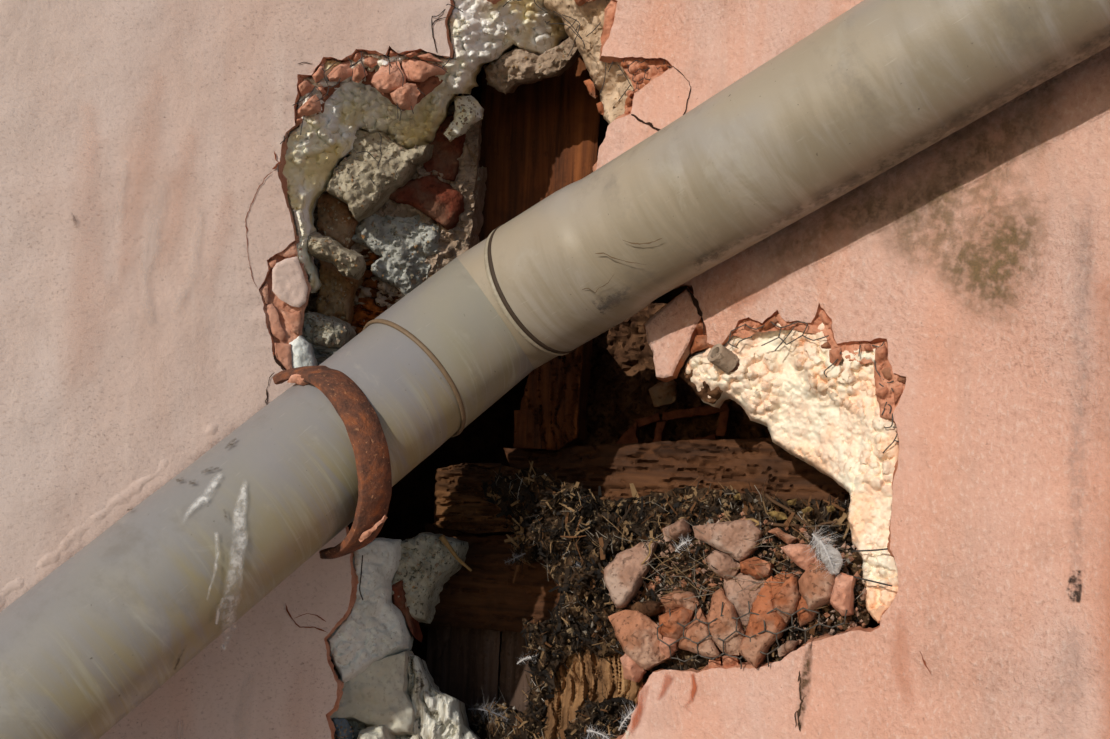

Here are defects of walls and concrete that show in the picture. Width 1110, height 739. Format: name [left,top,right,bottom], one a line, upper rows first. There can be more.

flaking render [600,0,616,44]
flaking render [289,48,447,136]
spalling [451,66,483,106]
flaking render [615,57,670,114]
crack [631,66,691,131]
crack [245,151,280,285]
flaking render [260,235,312,385]
spalling [651,286,693,304]
flaking render [732,309,906,419]
spalling [376,374,529,541]
spalling [409,622,428,662]
crack [794,671,807,731]